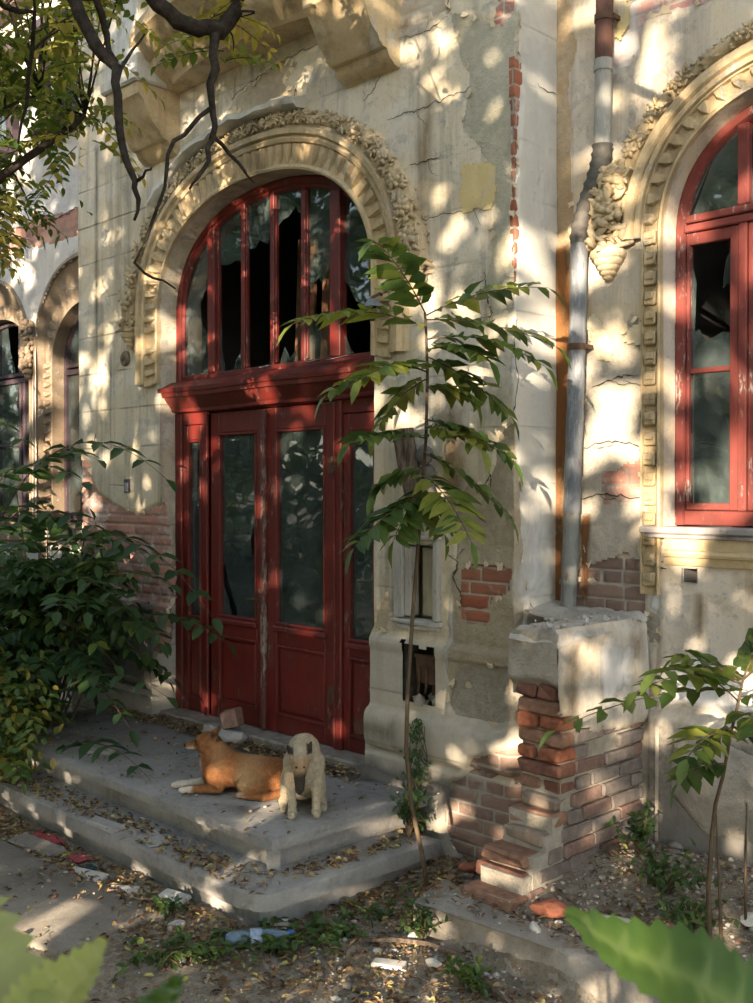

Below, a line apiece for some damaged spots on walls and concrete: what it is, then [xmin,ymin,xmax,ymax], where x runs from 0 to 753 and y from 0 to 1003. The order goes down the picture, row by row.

flaking render [613,0,714,69]
crack [387,86,471,124]
flaking render [400,0,522,322]
flaking render [557,0,577,285]
crack [593,374,640,387]
crack [583,440,640,451]
crack [584,492,639,500]
flaking render [577,299,662,647]
flaking render [81,455,177,655]
flaking render [405,418,529,727]
flaking render [444,749,523,859]